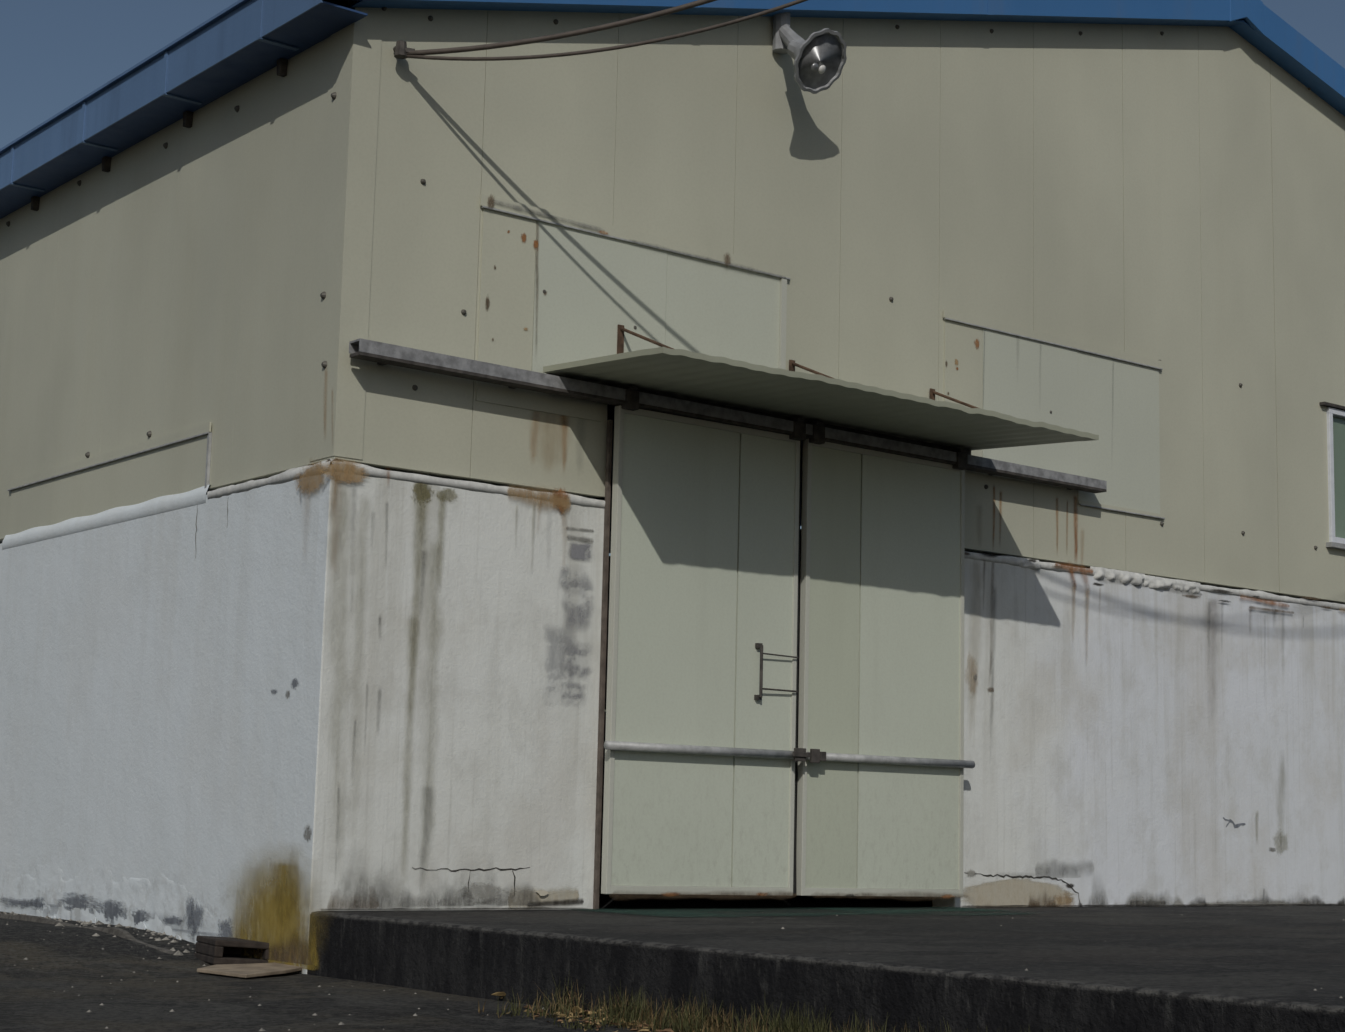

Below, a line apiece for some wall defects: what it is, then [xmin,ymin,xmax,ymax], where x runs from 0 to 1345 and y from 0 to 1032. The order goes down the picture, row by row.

rust [298,458,365,493]
water stain [413,483,454,532]
rust [508,488,571,512]
rust [1055,498,1093,596]
flaking render [963,870,1345,907]